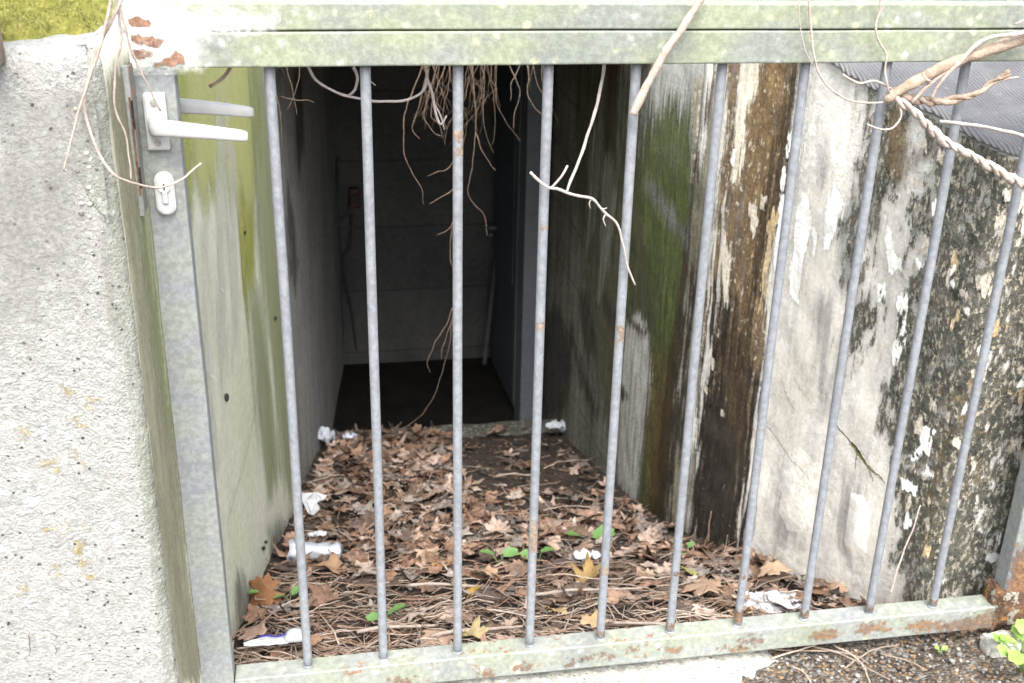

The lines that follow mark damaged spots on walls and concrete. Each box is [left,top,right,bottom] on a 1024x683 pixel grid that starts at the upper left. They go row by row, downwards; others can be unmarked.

damp [186,67,277,492]
damp [543,63,818,555]
damp [836,87,1024,602]
crack [837,426,886,484]
rust [1004,542,1024,593]
rust [809,629,842,641]
rust [855,603,1006,636]